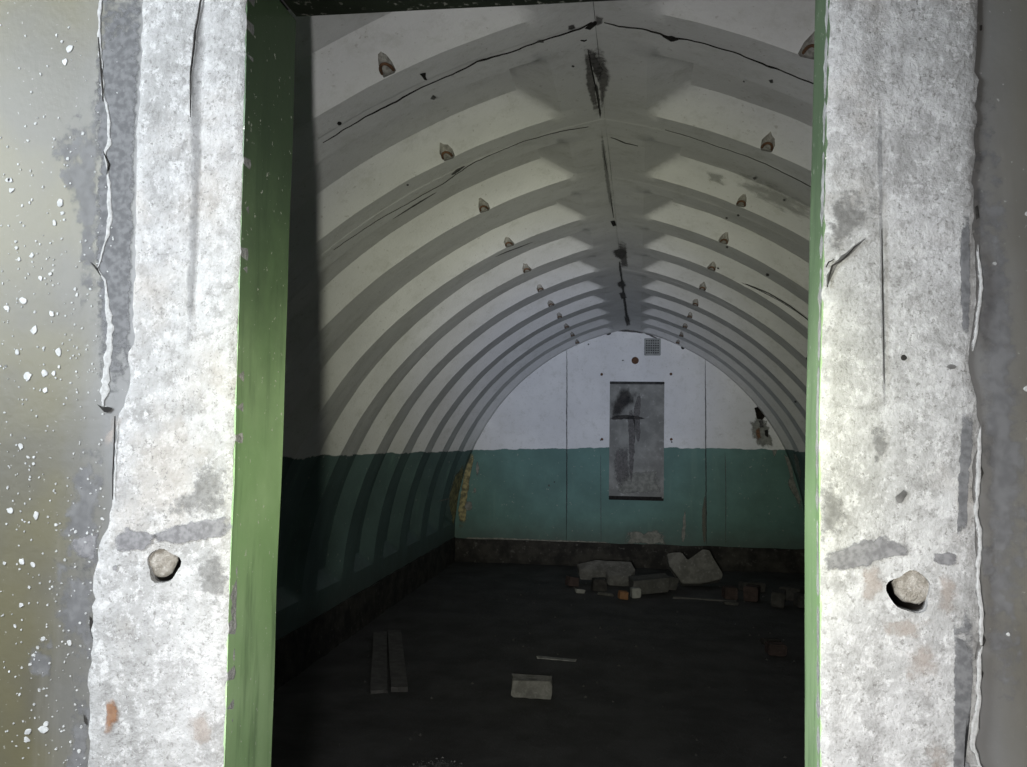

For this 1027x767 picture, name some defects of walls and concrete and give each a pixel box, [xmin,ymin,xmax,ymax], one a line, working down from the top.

crack [90,0,114,412]
crack [190,0,202,117]
crack [323,21,813,250]
leakage [585,53,609,109]
crack [610,194,630,326]
crack [826,191,885,380]
peeling [0,0,141,767]
peeling [957,417,973,532]
peeling [960,190,1027,614]
peeling [953,616,973,767]